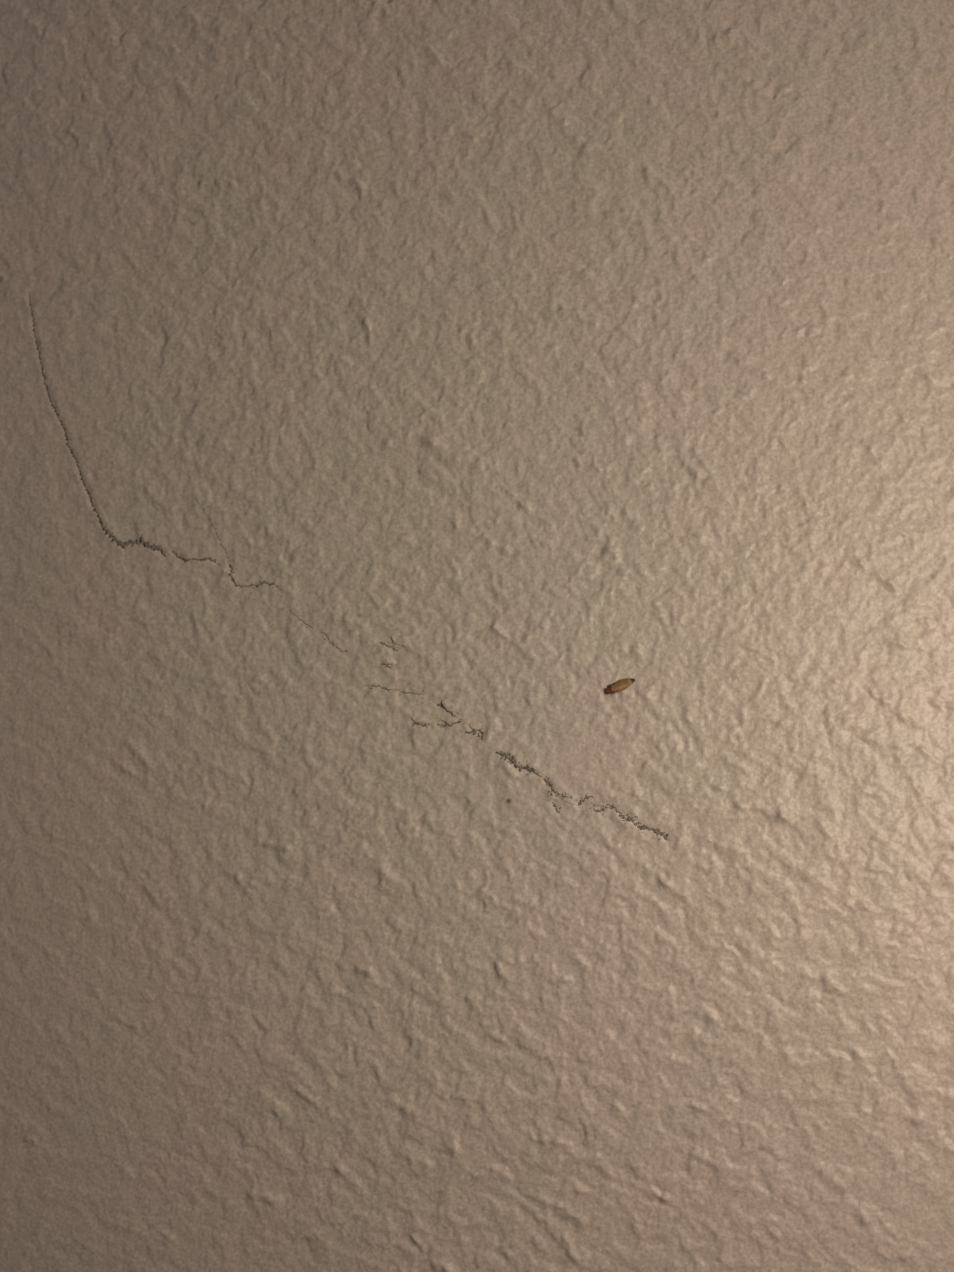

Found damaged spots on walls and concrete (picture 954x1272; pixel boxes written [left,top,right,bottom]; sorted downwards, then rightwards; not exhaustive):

crack [29,292,347,652]
crack [365,633,673,841]